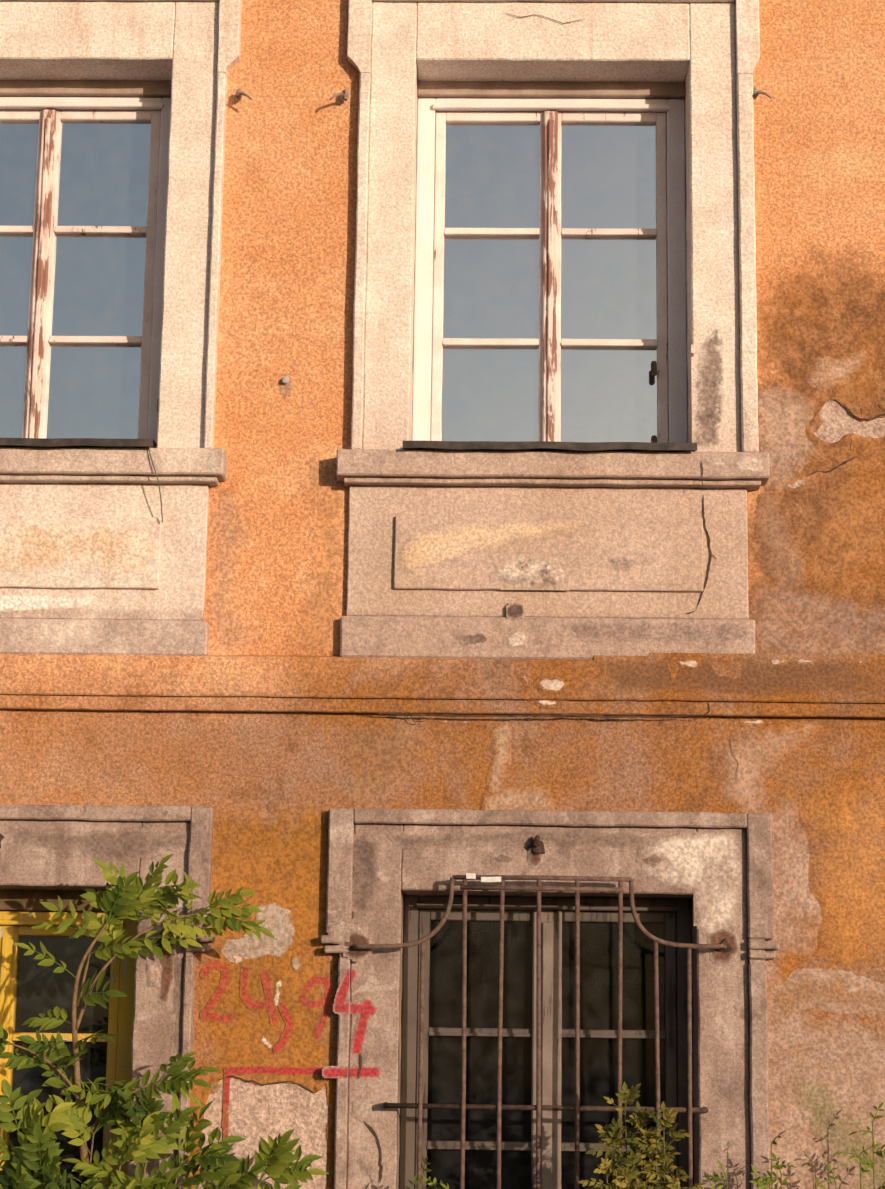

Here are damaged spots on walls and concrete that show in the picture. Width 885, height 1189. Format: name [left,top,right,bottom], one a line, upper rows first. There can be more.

spalling [805,348,885,457]
damp [562,238,885,701]
peeling [485,554,570,590]
crack [686,462,716,614]
spalling [518,673,582,709]
peeling [219,902,303,971]
peeling [274,979,282,1009]
corrosion [341,930,372,962]
peeling [636,829,743,939]
corrosion [708,928,740,966]
peeling [716,718,885,1189]
peeling [188,1074,336,1189]